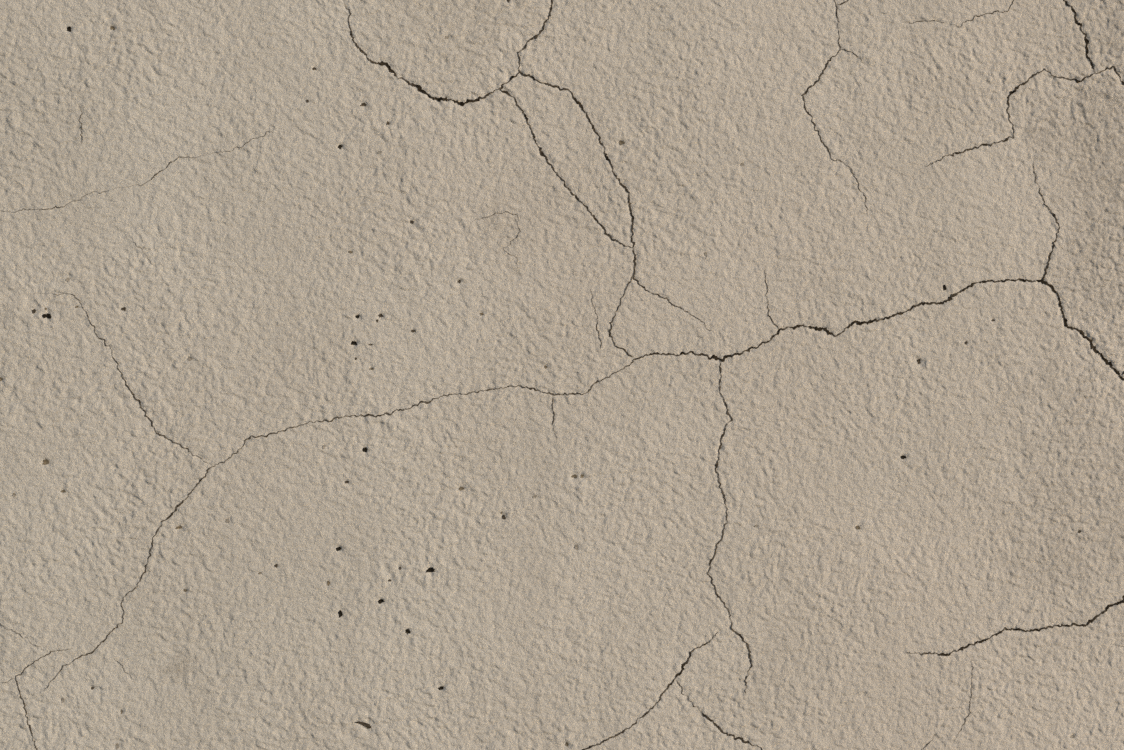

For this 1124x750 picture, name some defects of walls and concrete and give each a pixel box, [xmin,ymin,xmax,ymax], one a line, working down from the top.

crack [53,293,205,462]
crack [218,0,1124,693]
crack [45,466,215,689]
crack [0,623,70,749]
crack [582,630,762,750]
crack [907,595,1124,749]